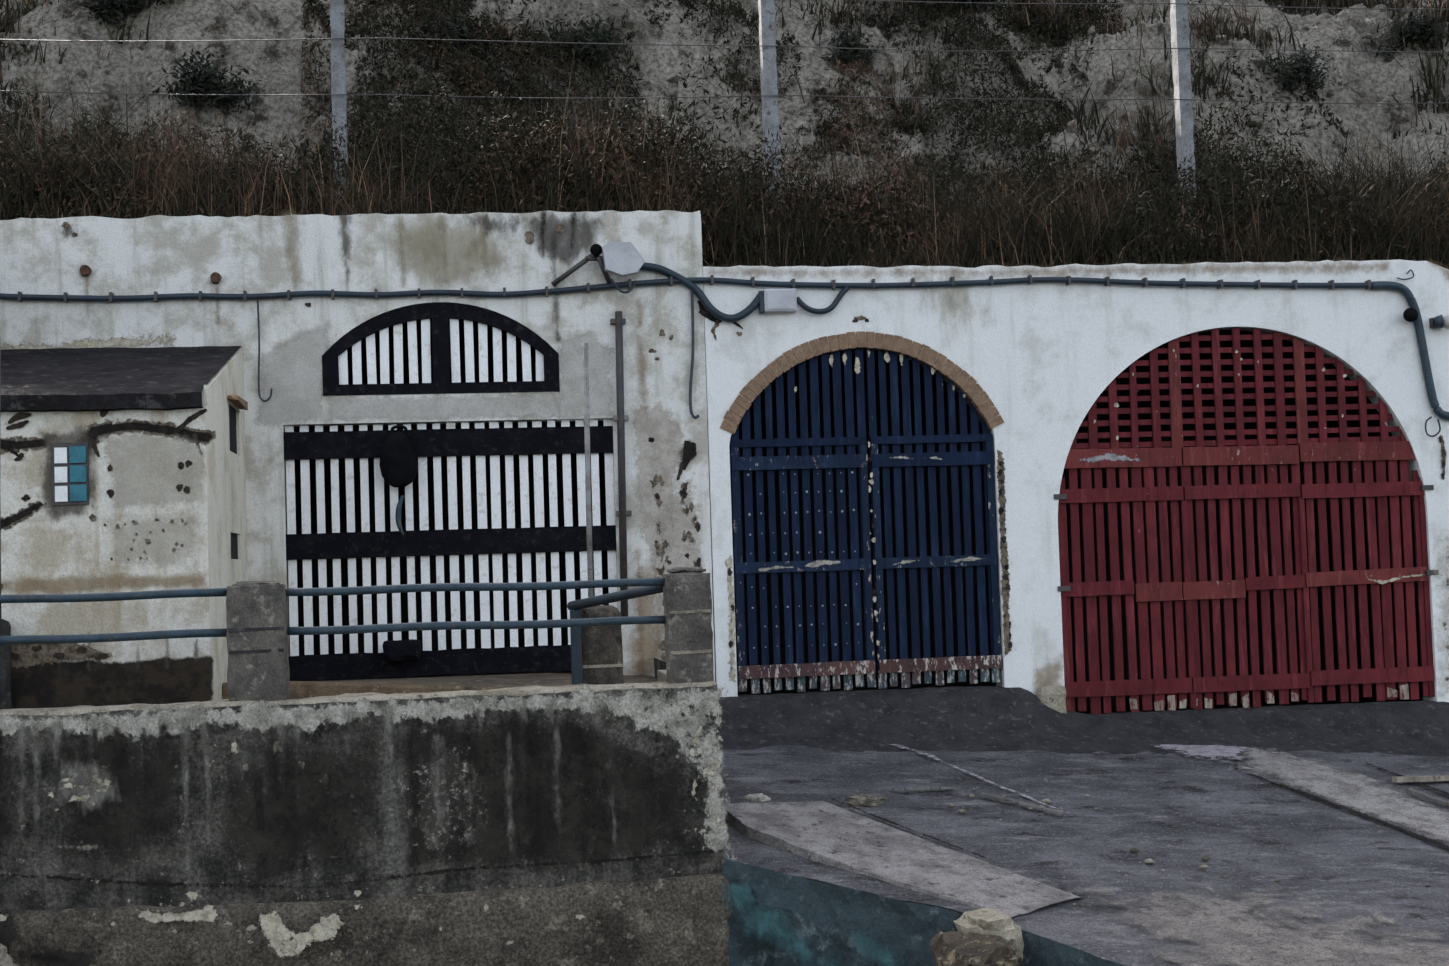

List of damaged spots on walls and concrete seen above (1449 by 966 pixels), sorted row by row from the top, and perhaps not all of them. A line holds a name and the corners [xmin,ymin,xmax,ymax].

peeling [6,412,31,430]
flaking render [89,435,202,562]
flaking render [634,402,701,662]
leakage [0,596,738,872]
spalling [127,891,345,961]